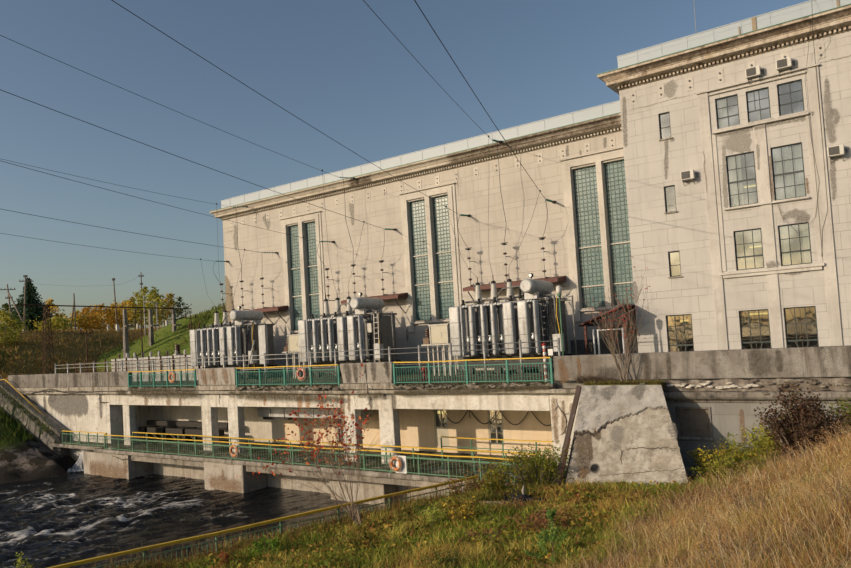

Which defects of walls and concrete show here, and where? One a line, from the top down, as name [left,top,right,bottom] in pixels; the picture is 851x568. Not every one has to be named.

leakage [824,81,839,142]
leakage [717,112,814,208]
leakage [784,210,809,223]
crack [555,399,676,482]